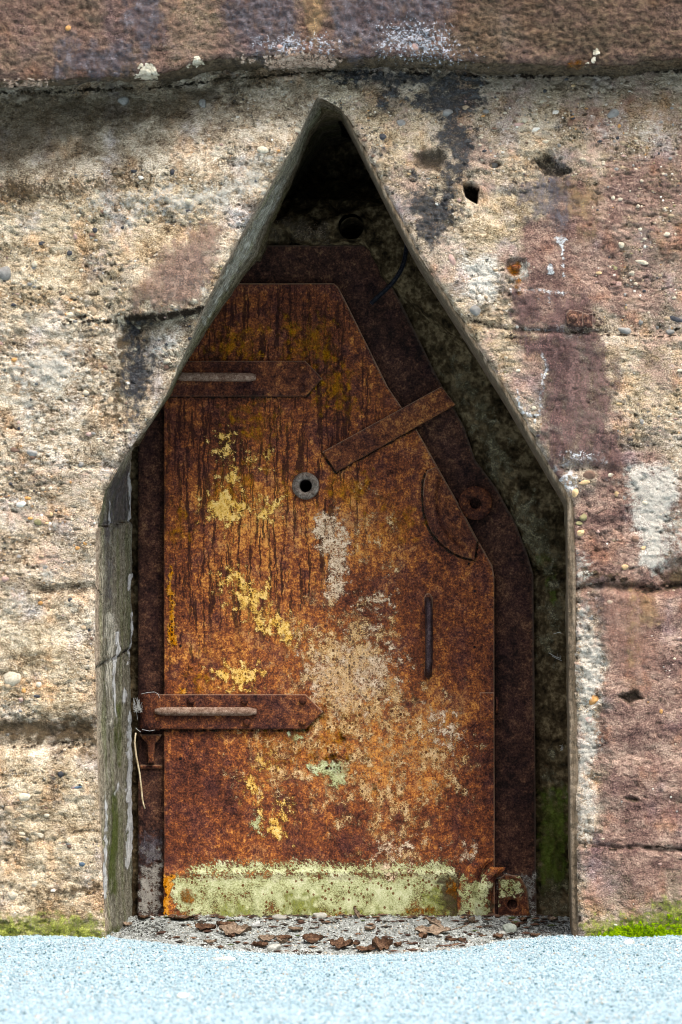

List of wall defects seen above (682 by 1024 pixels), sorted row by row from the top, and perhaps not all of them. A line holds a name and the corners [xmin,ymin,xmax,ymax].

leakage [55,0,164,77]
leakage [0,69,280,167]
leakage [226,0,488,251]
spalling [459,78,682,329]
rust [507,262,522,293]
spalling [82,343,178,415]
spalling [20,418,140,606]
peeling [195,430,287,539]
rust [167,564,178,647]
peeling [138,513,477,917]
rust [163,874,196,916]
rust [405,858,506,917]